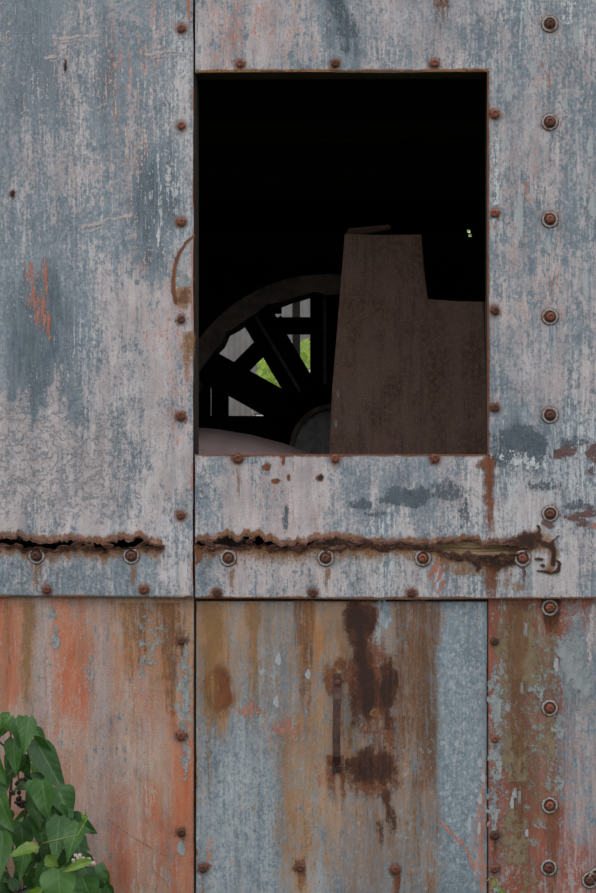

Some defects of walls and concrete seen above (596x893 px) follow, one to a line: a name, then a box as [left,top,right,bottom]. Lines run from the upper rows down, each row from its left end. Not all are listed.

peeling [25,258,51,341]
corrosion [181,227,195,380]
corrosion [190,68,496,532]
crack [0,532,165,564]
crack [194,524,562,575]
corrosion [186,562,596,845]